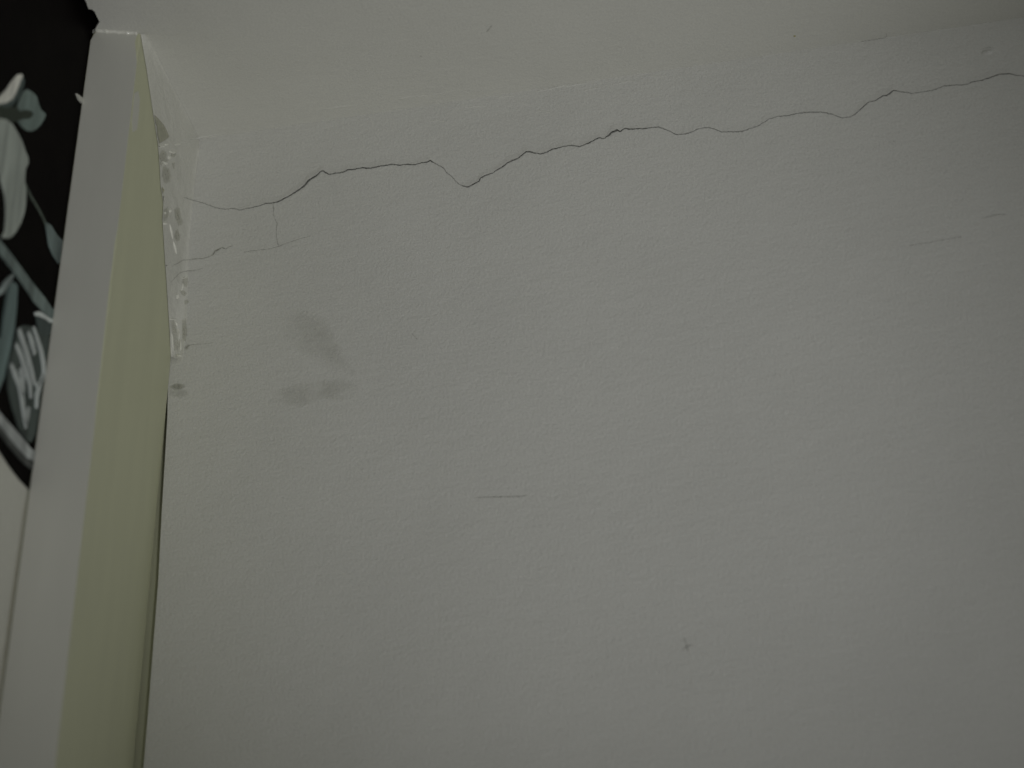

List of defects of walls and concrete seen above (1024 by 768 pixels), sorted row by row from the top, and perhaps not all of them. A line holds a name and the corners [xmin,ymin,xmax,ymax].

crack [193,67,1024,210]